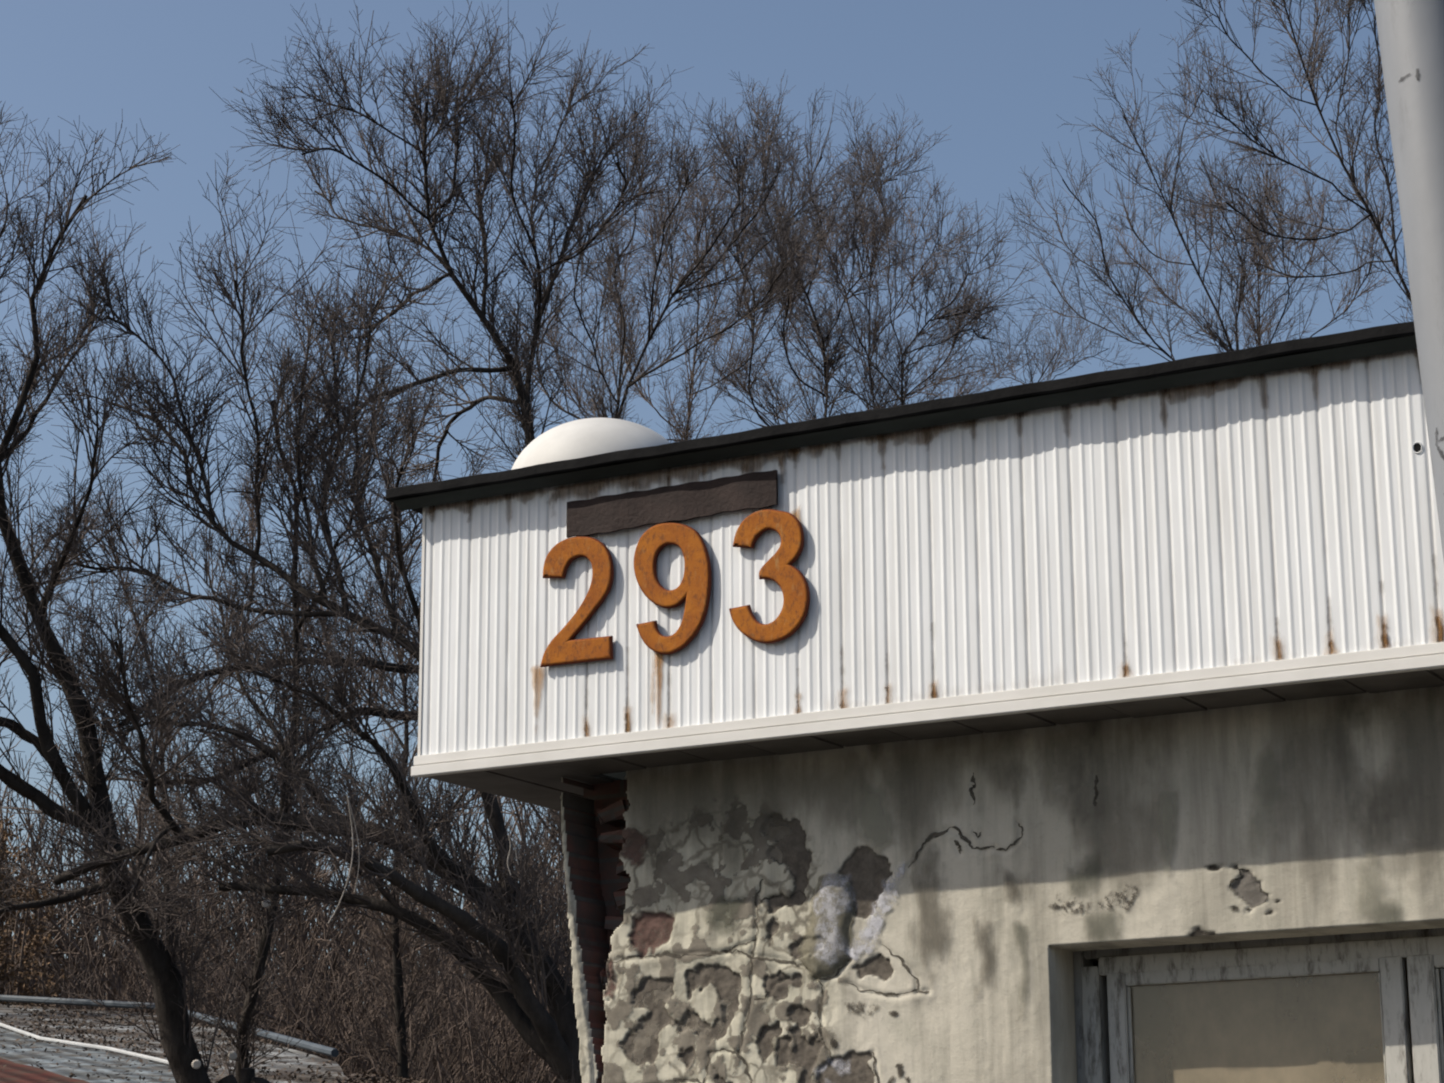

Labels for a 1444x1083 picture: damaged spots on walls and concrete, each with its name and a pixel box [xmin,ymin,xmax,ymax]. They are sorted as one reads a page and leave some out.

rust [1435,616,1444,642]
rust [533,668,543,700]
rust [655,652,663,693]
crack [908,773,1023,868]
water stain [815,862,945,963]
peeling [1050,886,1138,913]
spalling [1207,865,1279,914]
peeling [597,799,909,1083]